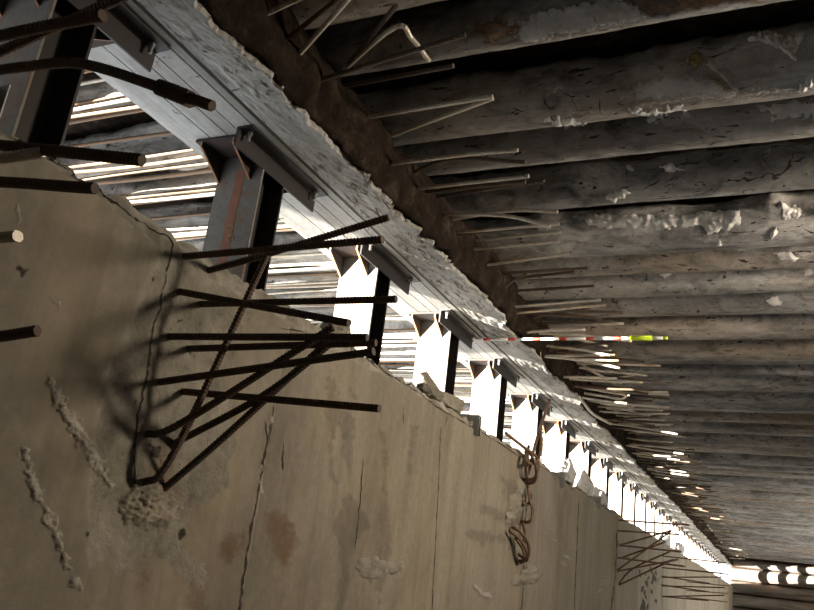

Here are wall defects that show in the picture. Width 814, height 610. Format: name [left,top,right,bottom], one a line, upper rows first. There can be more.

rust [644,0,757,13]
crack [46,156,174,484]
spalling [120,481,183,530]